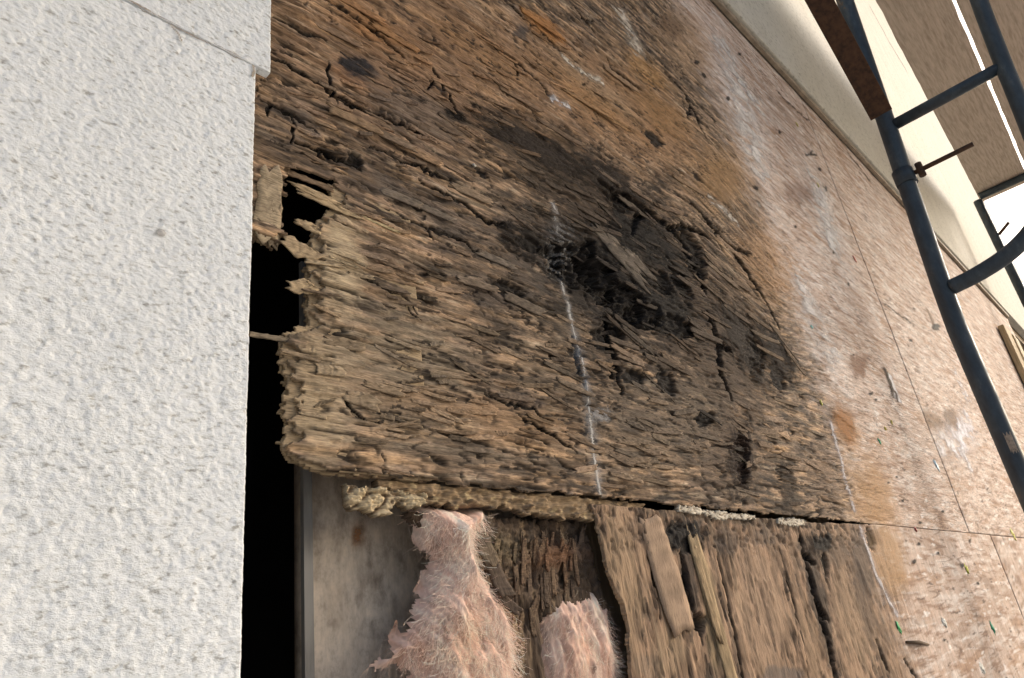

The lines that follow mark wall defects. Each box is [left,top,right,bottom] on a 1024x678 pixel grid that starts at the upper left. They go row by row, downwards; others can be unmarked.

crack [130,0,423,136]
water stain [338,56,374,78]
water stain [615,8,643,53]
crack [261,101,502,226]
water stain [444,103,703,341]
crack [707,318,727,391]
water stain [711,301,799,387]
rust [835,407,854,442]
spalling [371,357,695,677]